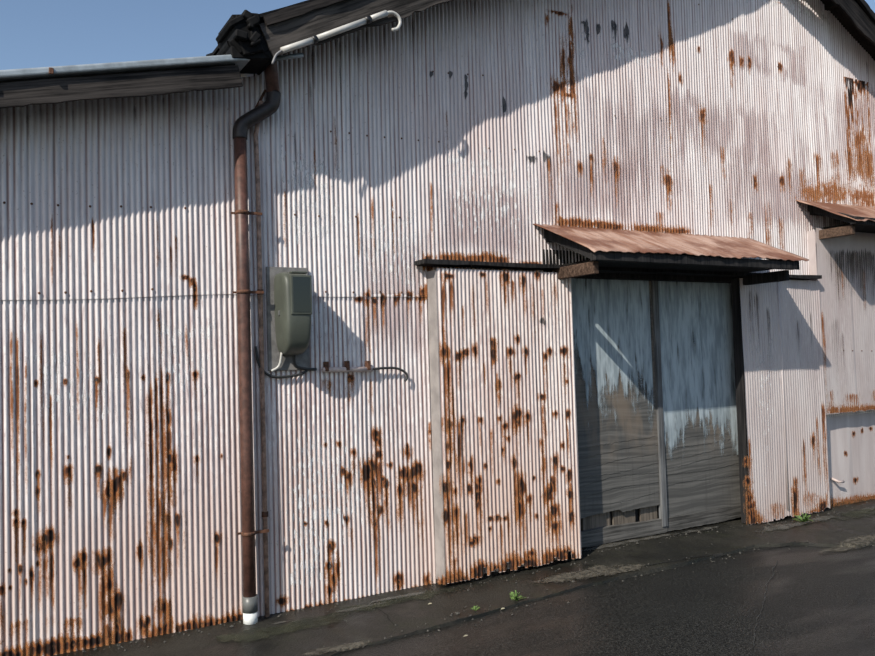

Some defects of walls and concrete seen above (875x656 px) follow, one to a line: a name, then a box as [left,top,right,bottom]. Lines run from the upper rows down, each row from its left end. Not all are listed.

corrosion [545,10,578,155]
corrosion [578,138,620,196]
corrosion [660,3,675,64]
corrosion [729,50,751,73]
corrosion [779,77,875,207]
corrosion [181,275,197,307]
corrosion [354,284,428,339]
corrosion [10,332,52,473]
corrosion [0,365,243,656]
corrosion [324,428,423,580]
corrosion [773,391,875,516]
corrosion [393,572,404,590]